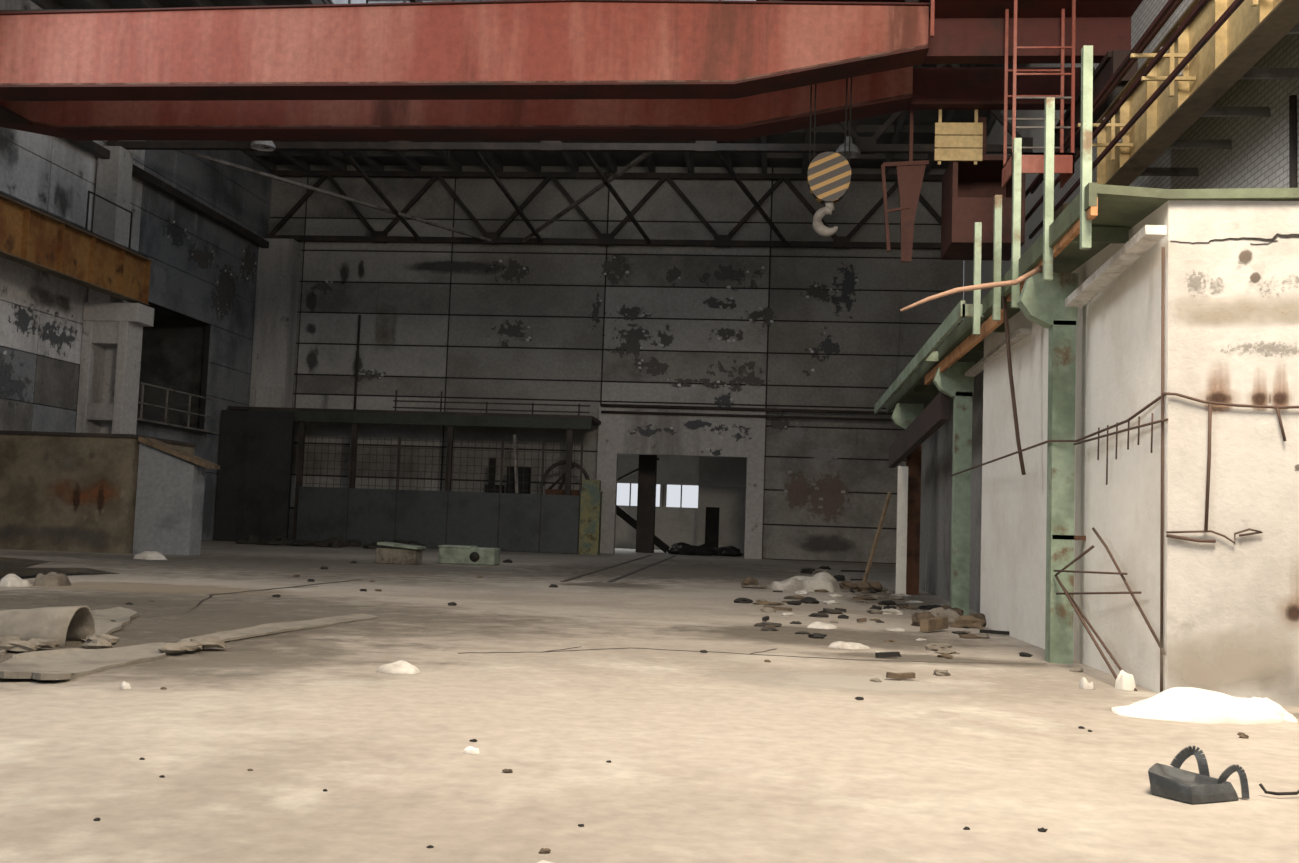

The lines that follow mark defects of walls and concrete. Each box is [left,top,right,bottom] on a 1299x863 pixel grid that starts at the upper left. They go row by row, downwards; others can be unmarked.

crack [1171,233,1299,245]
peeling [699,264,776,342]
peeling [591,254,764,407]
corrosion [1209,379,1230,411]
corrosion [1254,387,1286,409]
peeling [630,420,752,456]
corrosion [1288,606,1299,620]